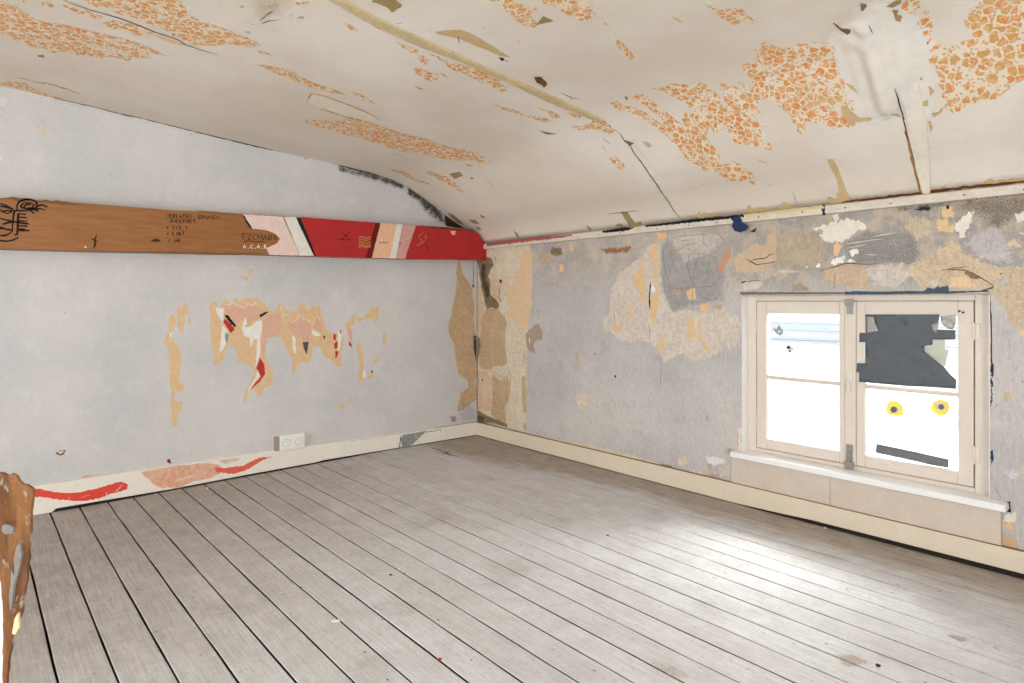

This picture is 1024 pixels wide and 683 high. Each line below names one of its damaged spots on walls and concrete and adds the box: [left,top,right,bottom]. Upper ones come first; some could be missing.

peeling [0,77,79,99]
peeling [615,40,634,60]
peeling [842,106,872,127]
peeling [886,0,933,46]
peeling [920,77,943,133]
peeling [164,303,190,426]
peeling [209,297,386,403]
peeling [448,230,543,433]
crack [614,129,728,312]
peeling [602,159,851,363]
flaking render [740,205,1024,406]
peeling [994,487,1018,549]